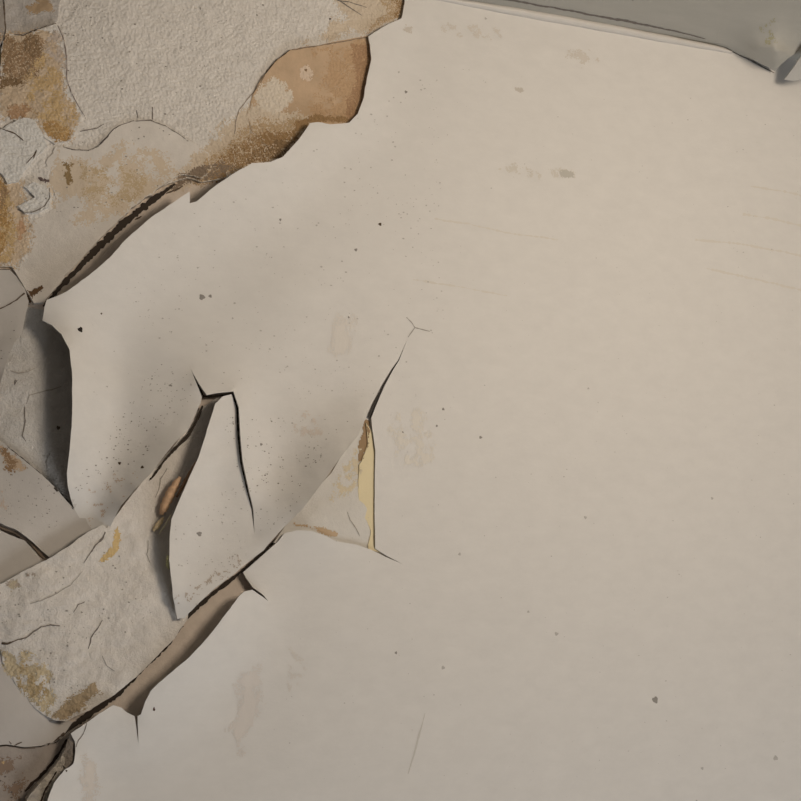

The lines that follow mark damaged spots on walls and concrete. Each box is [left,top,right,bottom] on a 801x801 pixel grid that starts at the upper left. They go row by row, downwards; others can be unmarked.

crack [507,0,705,39]
damp [0,0,404,227]
peeling [784,56,801,81]
damp [0,174,36,270]
spalling [0,0,404,721]
spalling [25,735,74,801]